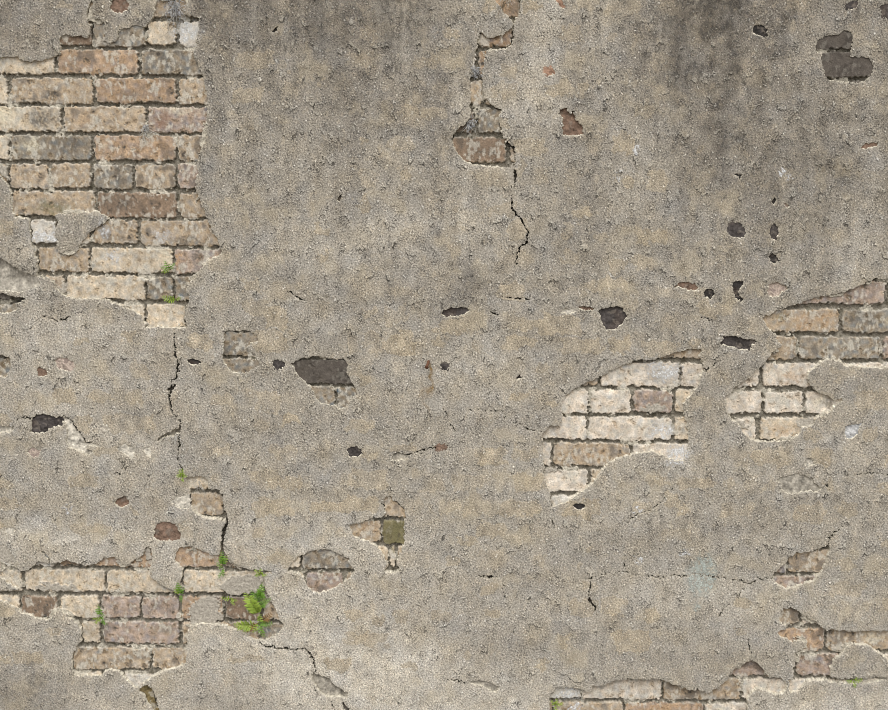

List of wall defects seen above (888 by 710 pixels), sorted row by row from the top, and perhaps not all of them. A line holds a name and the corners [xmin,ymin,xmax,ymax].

spalling [0,0,223,329]
spalling [451,0,521,187]
crack [506,139,530,267]
spalling [816,30,874,83]
crack [167,333,184,475]
spalling [272,356,357,410]
spalling [541,349,705,510]
spalling [720,278,888,443]
crack [220,518,228,540]
spalling [0,522,284,710]
crack [259,641,335,710]
spalling [549,607,888,710]